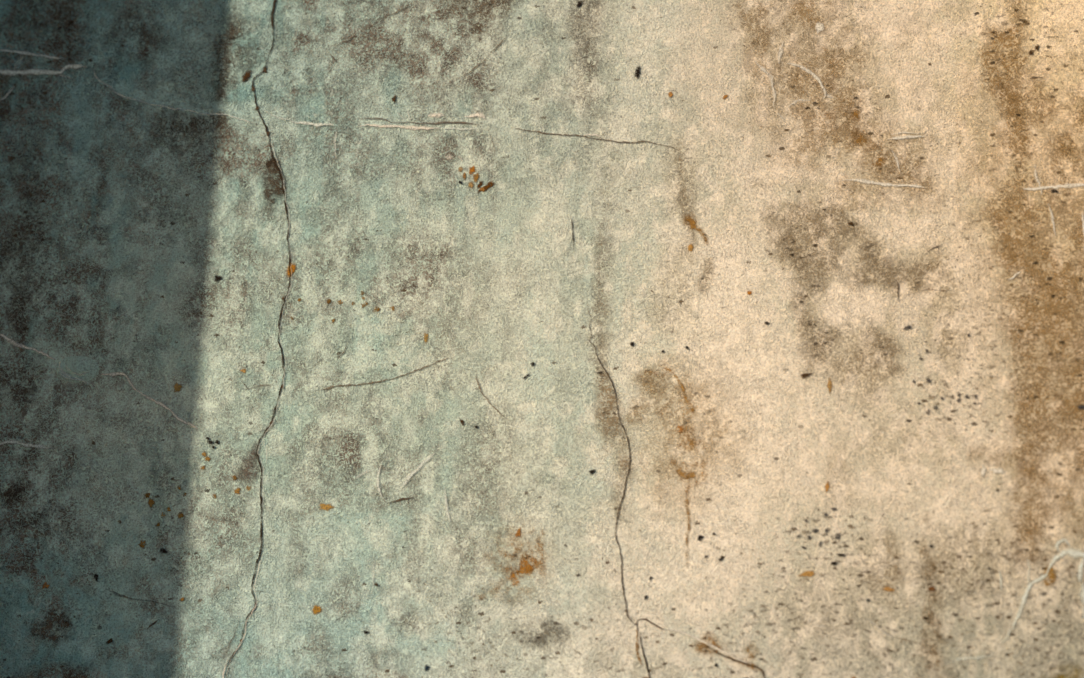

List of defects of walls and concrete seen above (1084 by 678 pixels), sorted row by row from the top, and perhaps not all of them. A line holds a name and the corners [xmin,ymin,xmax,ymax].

crack [332,4,409,61]
crack [364,113,495,149]
crack [516,128,674,148]
rust [458,166,494,193]
water stain [982,0,1084,435]
crack [0,0,336,678]
crack [322,358,447,390]
crack [362,454,434,505]
crack [588,311,765,678]
rust [673,462,704,556]
rust [504,528,544,585]